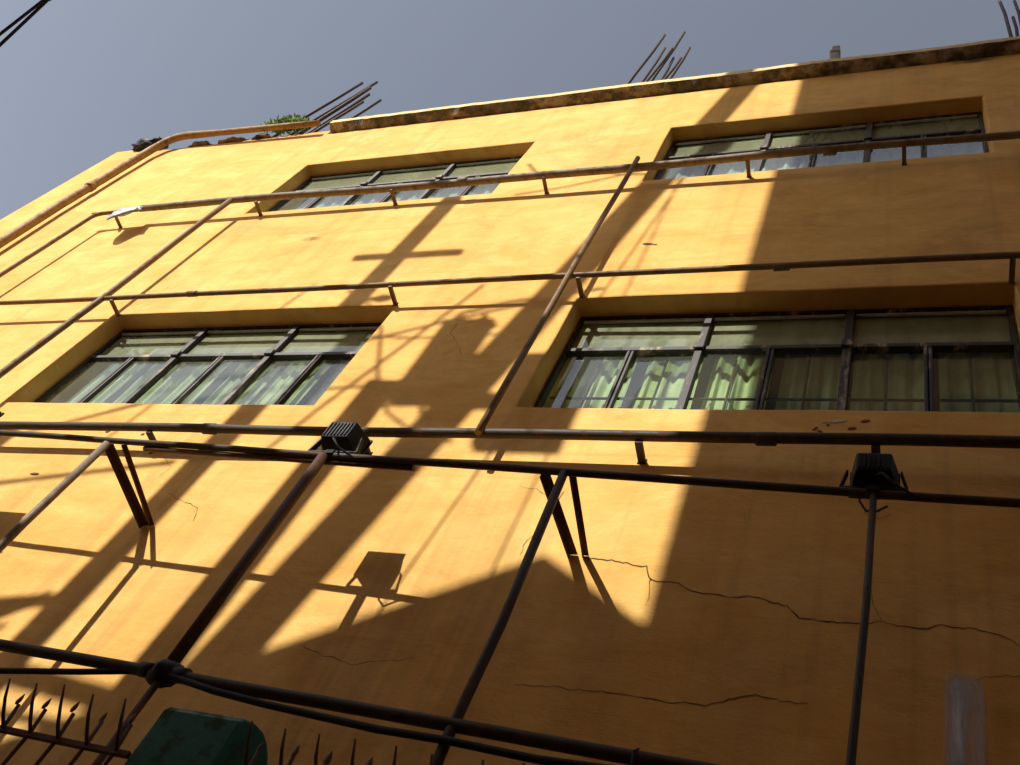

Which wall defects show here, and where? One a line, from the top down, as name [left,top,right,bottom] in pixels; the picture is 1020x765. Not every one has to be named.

crack [583,557,1020,646]
crack [519,684,808,707]